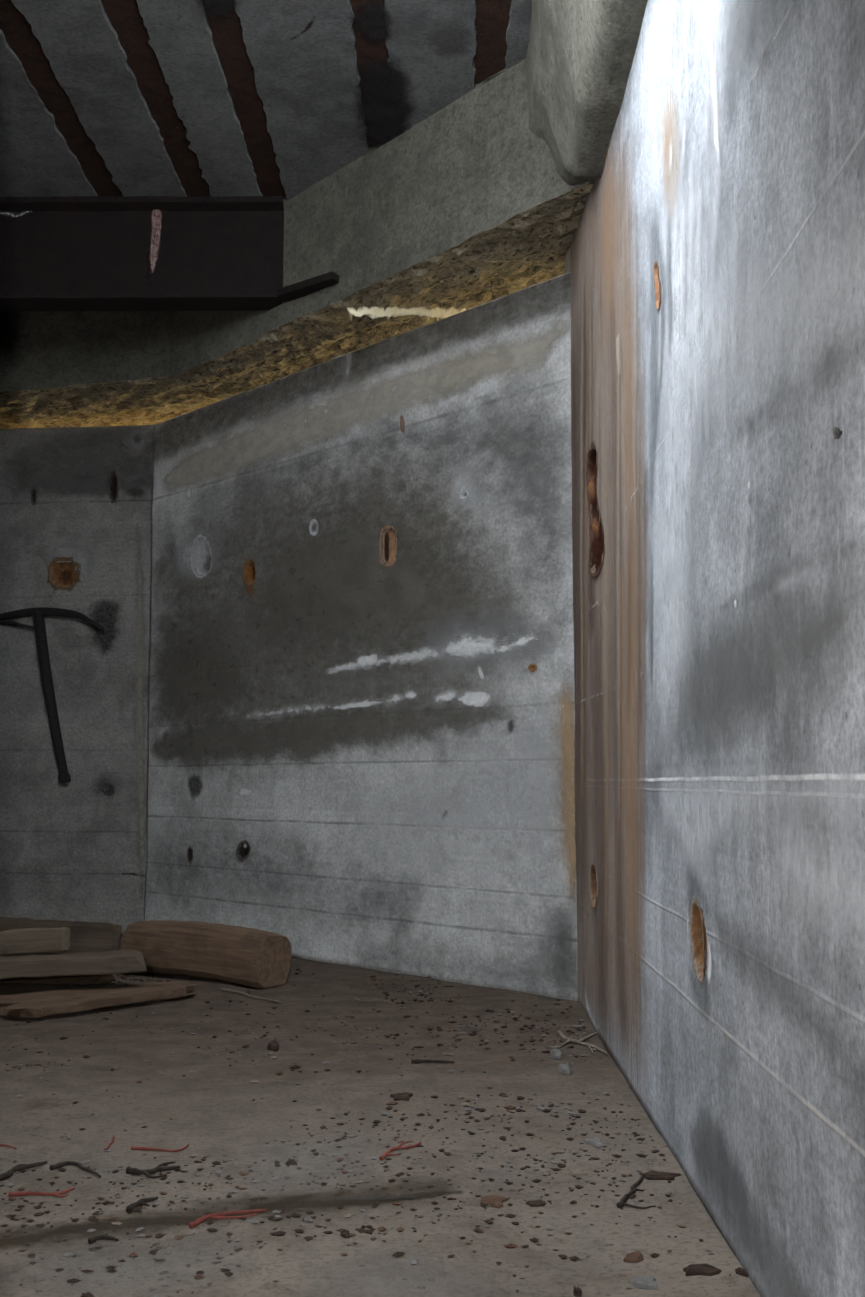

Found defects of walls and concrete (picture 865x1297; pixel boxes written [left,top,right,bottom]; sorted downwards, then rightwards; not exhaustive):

leakage [90,600,119,653]
leakage [153,439,540,762]
leakage [439,407,565,562]
corrosion [559,154,644,1065]